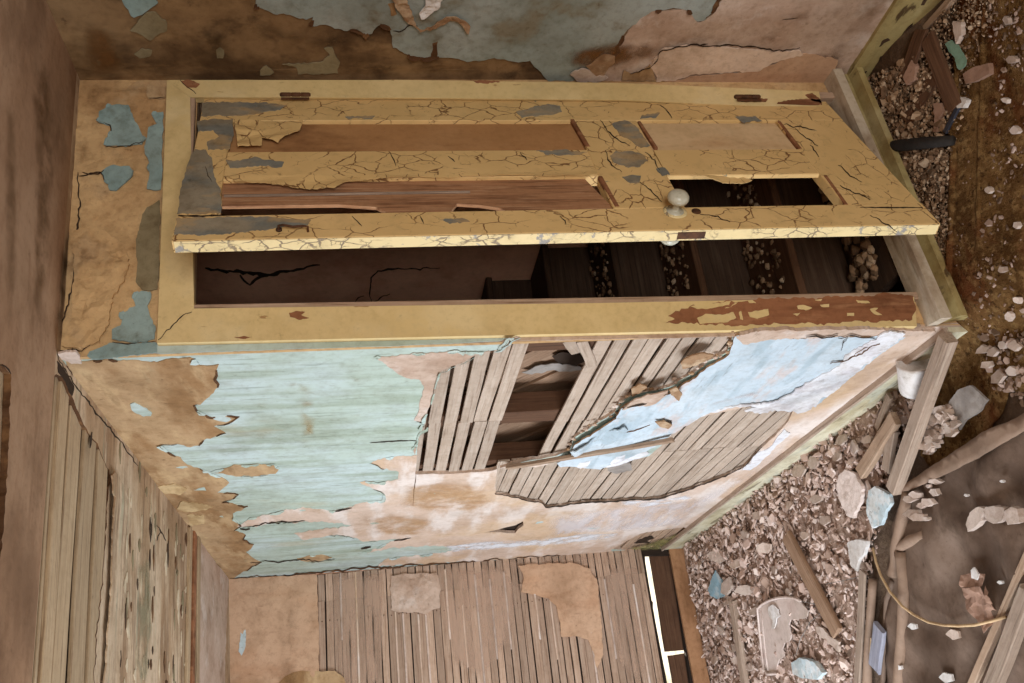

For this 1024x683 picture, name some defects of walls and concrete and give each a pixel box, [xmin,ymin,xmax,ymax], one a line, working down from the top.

peeling [253,0,893,105]
crack [76,119,142,230]
crack [62,270,74,321]
crack [205,264,320,286]
peeling [66,292,945,683]